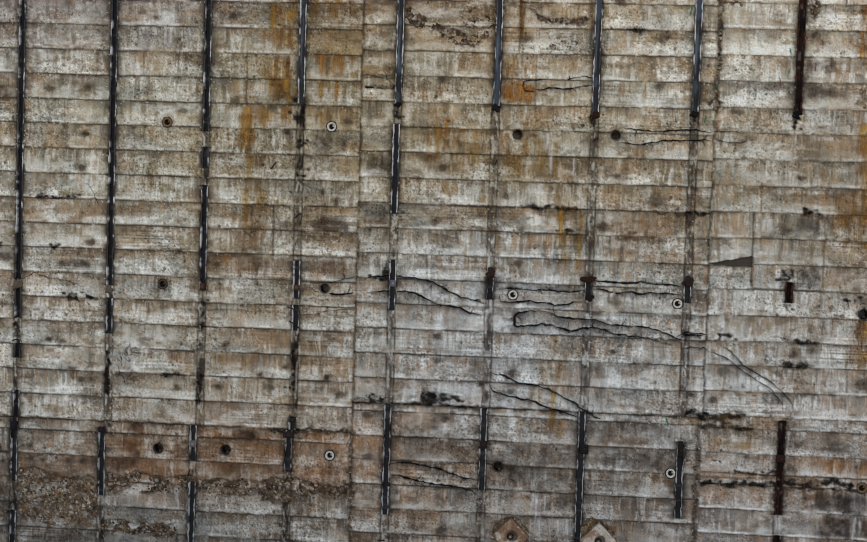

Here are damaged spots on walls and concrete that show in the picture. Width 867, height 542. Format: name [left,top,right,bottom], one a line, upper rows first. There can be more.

rust [265,0,298,119]
spalling [854,80,867,110]
rust [239,106,269,177]
crack [303,273,793,405]
crack [490,372,600,419]
spalling [16,466,359,540]
crack [391,461,477,495]